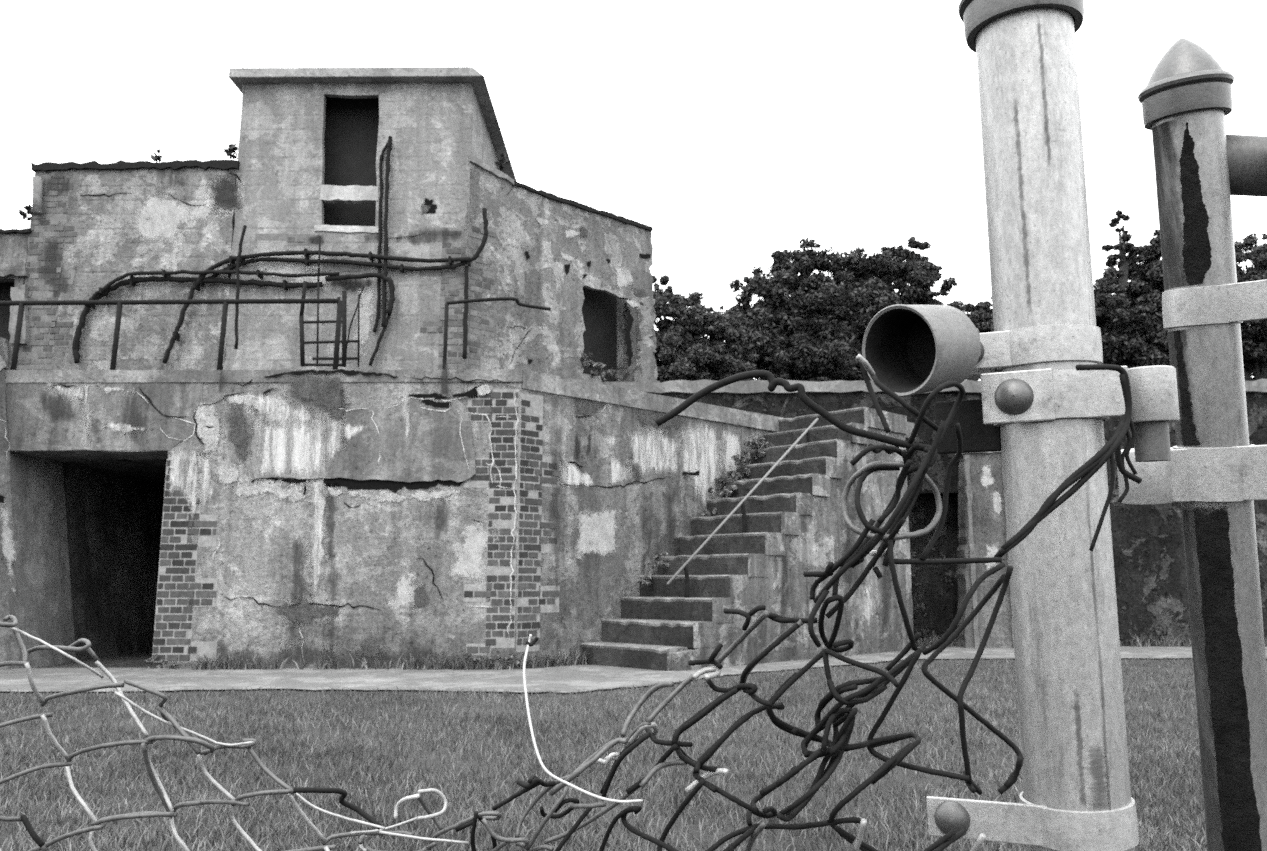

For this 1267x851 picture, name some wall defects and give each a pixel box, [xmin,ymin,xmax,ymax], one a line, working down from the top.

peeling [565,227,588,238]
spalling [615,265,647,382]
crack [137,380,277,445]
peeling [448,520,501,579]
peeling [575,510,617,559]